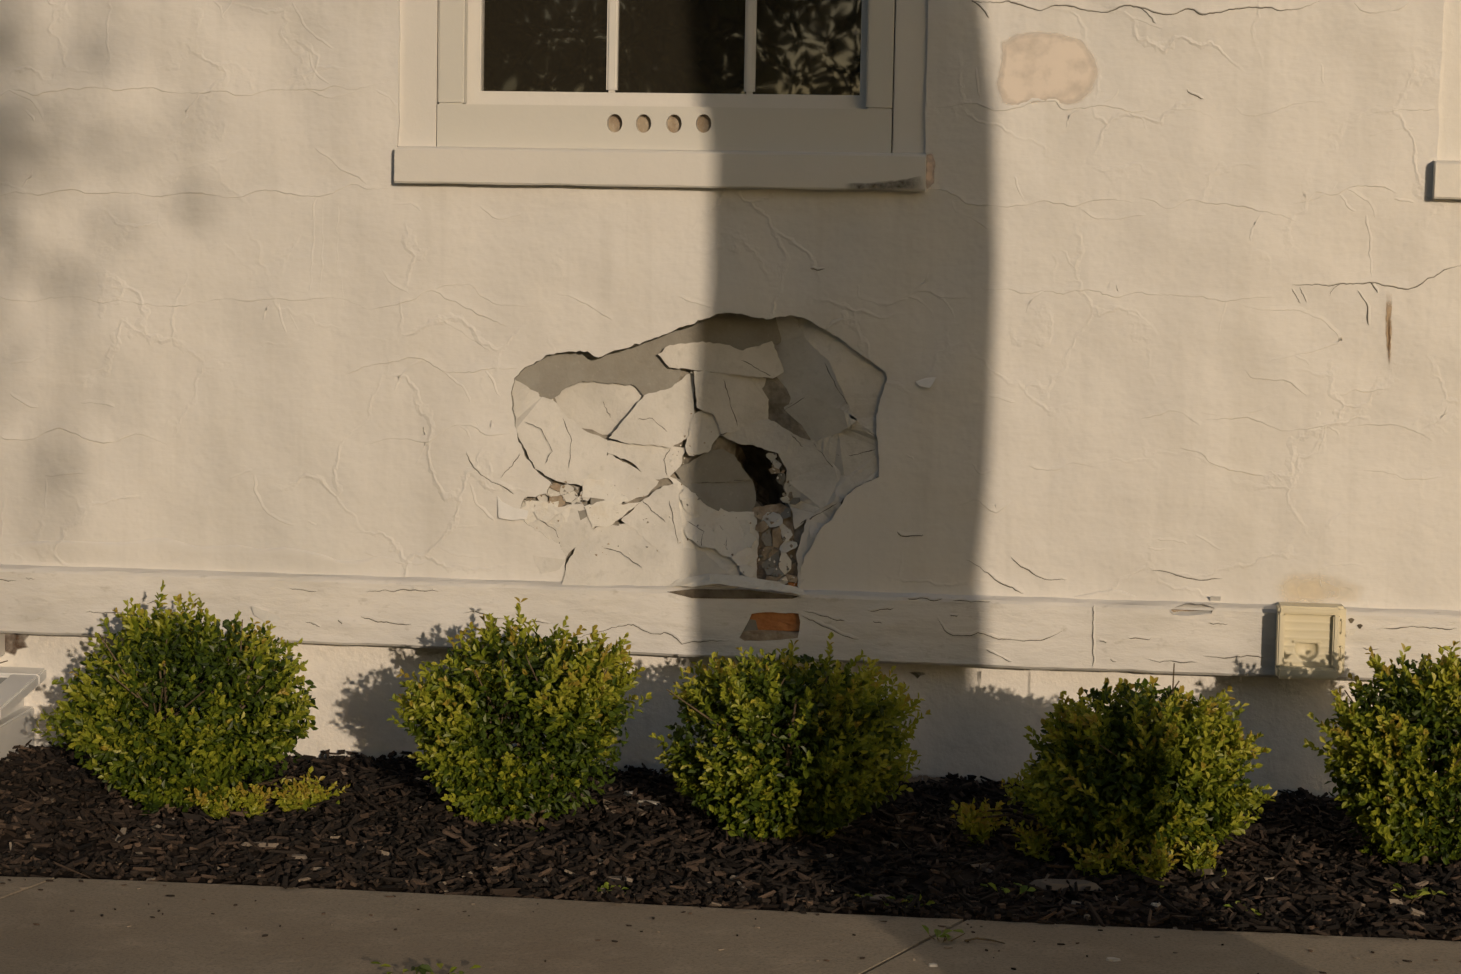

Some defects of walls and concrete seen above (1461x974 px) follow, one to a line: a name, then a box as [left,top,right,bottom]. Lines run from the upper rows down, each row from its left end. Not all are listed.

crack [972,0,1321,23]
crack [1187,88,1204,99]
crack [1243,215,1461,366]
crack [466,451,520,521]
flaking render [497,313,887,641]
crack [289,586,730,644]
crack [801,555,1264,668]
crack [1363,624,1457,650]